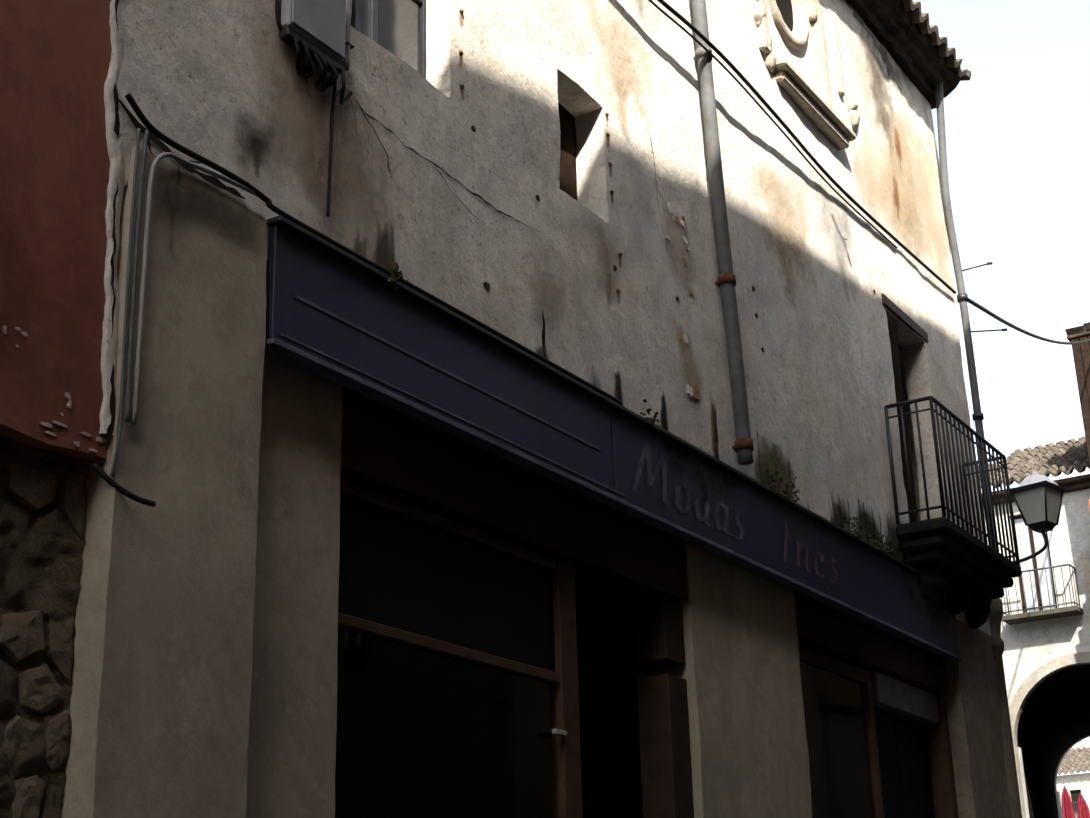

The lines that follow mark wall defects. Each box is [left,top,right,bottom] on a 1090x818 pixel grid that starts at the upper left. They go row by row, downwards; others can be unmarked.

water stain [245,64,364,197]
crack [341,82,540,232]
water stain [537,310,549,360]
peeling [40,392,72,437]
water stain [615,373,623,406]
water stain [831,495,910,566]